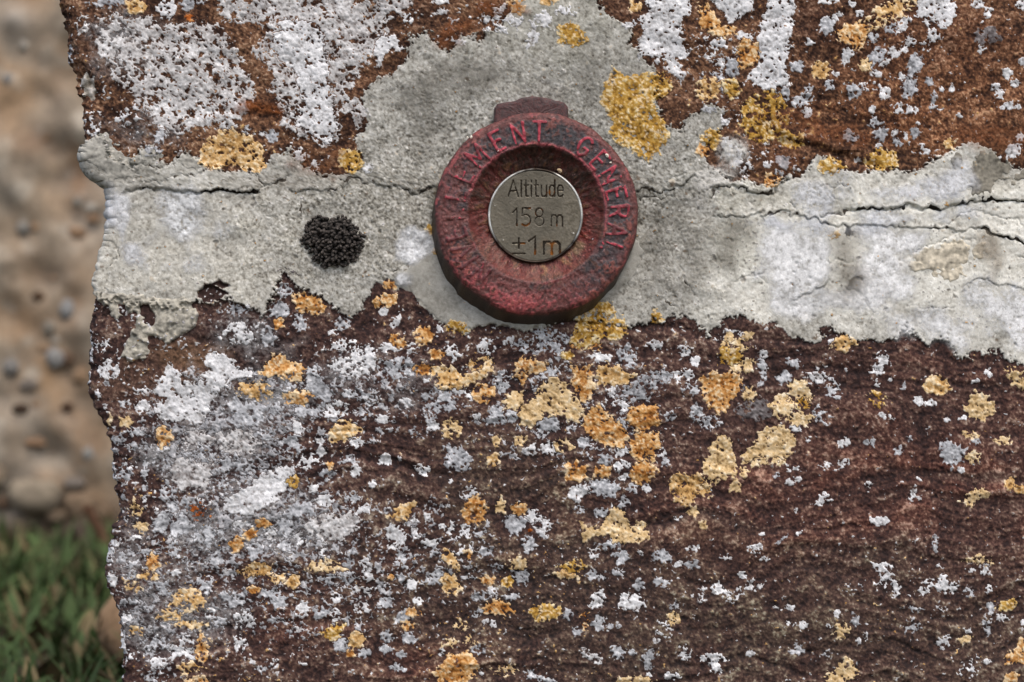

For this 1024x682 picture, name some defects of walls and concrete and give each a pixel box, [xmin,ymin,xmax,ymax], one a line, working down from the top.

crack [142,164,362,213]
crack [387,185,434,195]
crack [639,176,1024,258]